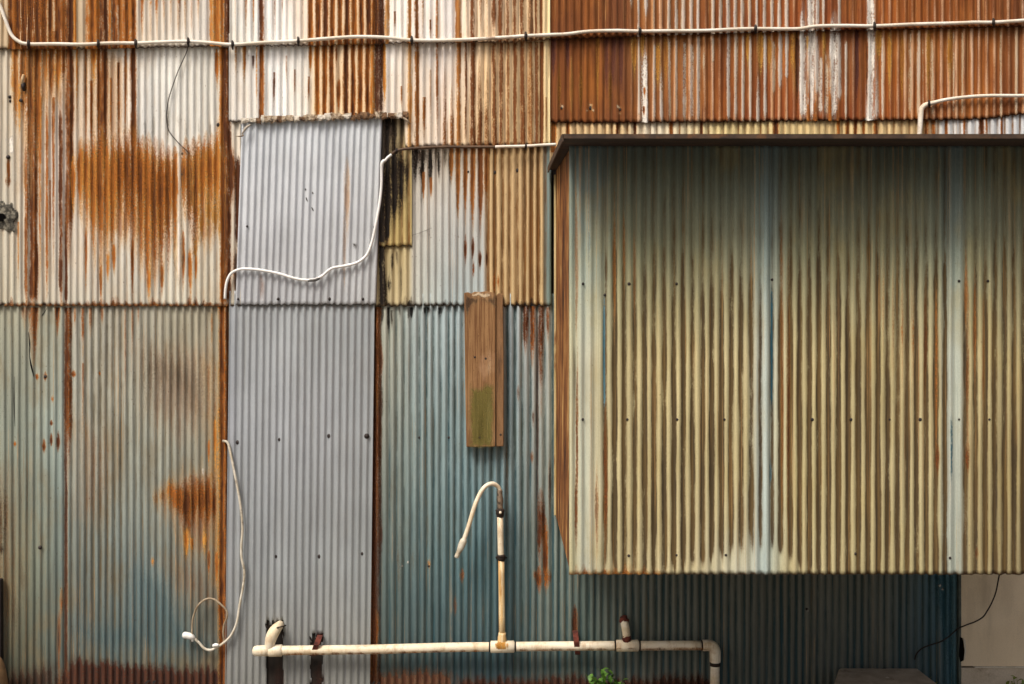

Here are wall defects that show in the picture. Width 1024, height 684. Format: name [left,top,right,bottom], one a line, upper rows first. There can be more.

corrosion [294,0,570,224]
corrosion [631,35,668,84]
corrosion [746,32,772,72]
corrosion [790,33,878,134]
corrosion [855,30,904,100]
corrosion [924,119,948,134]
corrosion [979,118,988,134]
corrosion [8,0,283,684]
corrosion [284,306,710,684]